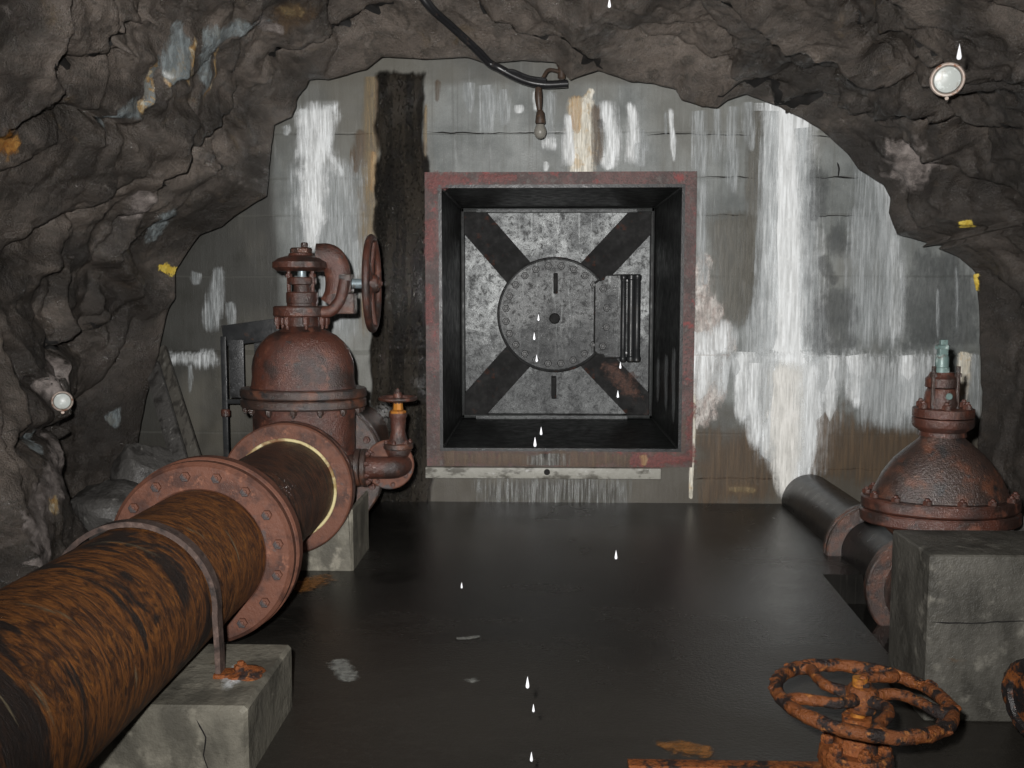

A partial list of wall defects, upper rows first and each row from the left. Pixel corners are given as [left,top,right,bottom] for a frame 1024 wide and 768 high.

leakage [470,82,643,172]
corrosion [592,106,602,162]
leakage [284,103,359,275]
leakage [370,71,433,502]
leakage [689,102,937,499]
leakage [171,351,215,376]
corrosion [658,741,712,758]